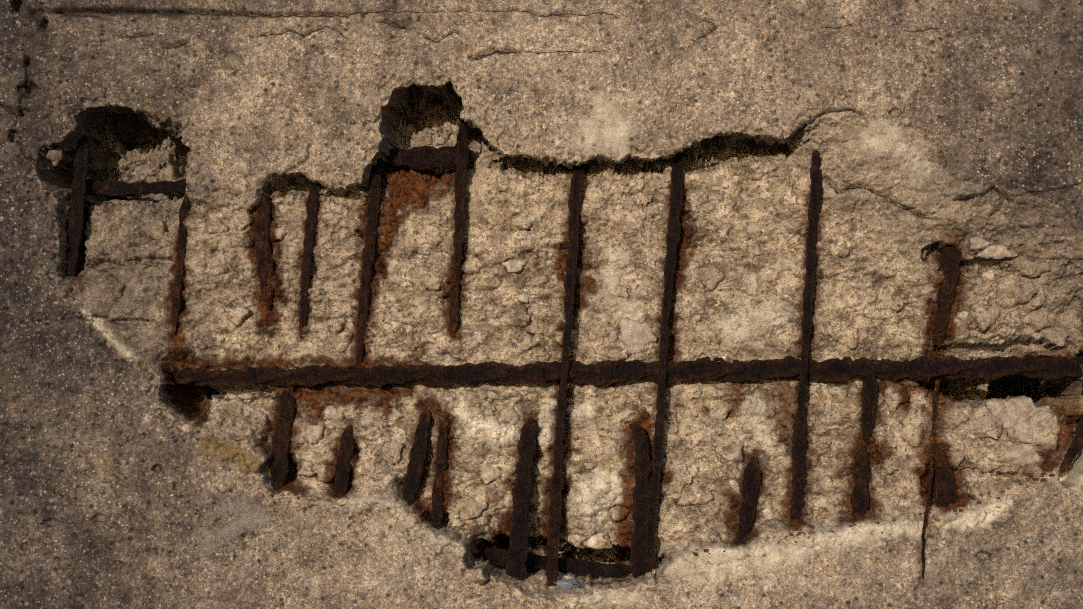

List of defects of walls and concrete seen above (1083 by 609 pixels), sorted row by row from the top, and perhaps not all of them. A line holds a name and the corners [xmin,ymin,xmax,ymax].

crack [0,9,618,163]
crack [788,109,868,143]
crack [825,179,1078,220]
spalling [36,81,1083,566]
rust [65,120,1083,587]
spalling [477,364,1083,601]